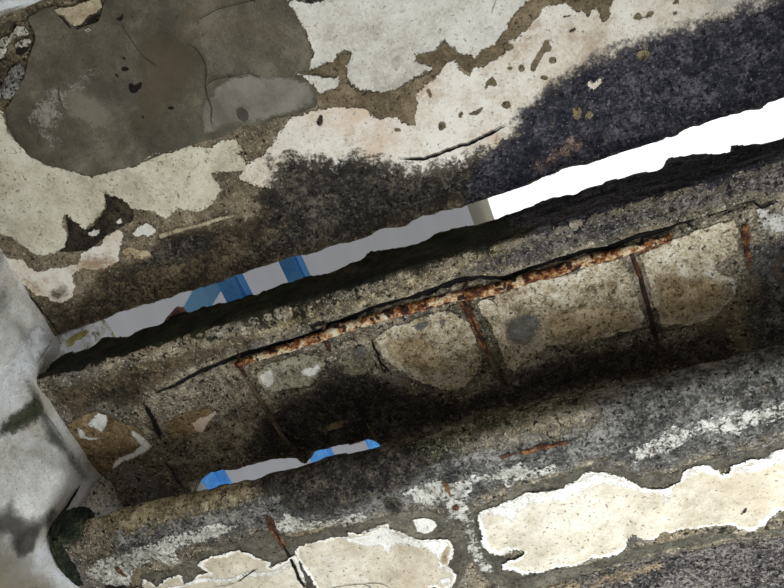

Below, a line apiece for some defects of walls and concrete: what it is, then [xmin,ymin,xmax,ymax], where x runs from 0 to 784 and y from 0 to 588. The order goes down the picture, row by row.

peeling [0,0,778,303]
crack [400,125,507,161]
damp [0,0,784,469]
crack [145,201,776,438]
corrosion [459,290,489,361]
peeling [234,219,739,392]
peeling [68,411,151,517]
corrosion [267,517,287,550]
peeling [138,440,784,588]